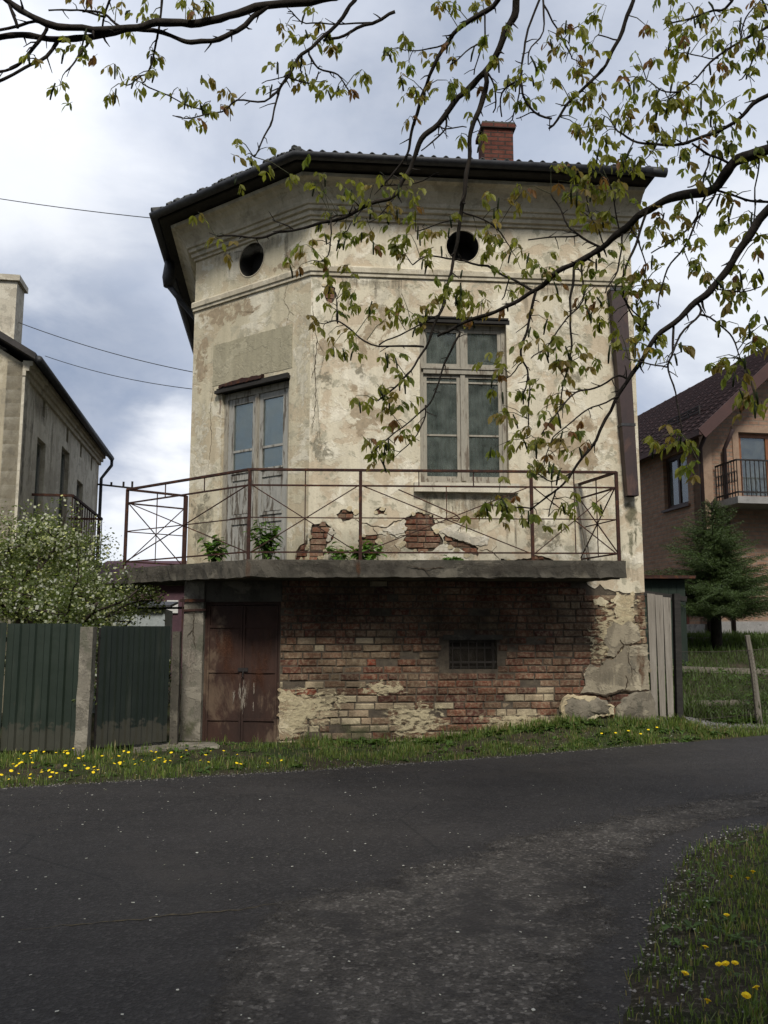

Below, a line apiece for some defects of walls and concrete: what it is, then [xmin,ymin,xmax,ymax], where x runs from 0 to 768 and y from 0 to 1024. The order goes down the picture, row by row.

spalling [296,506,359,560]
spalling [358,511,489,558]